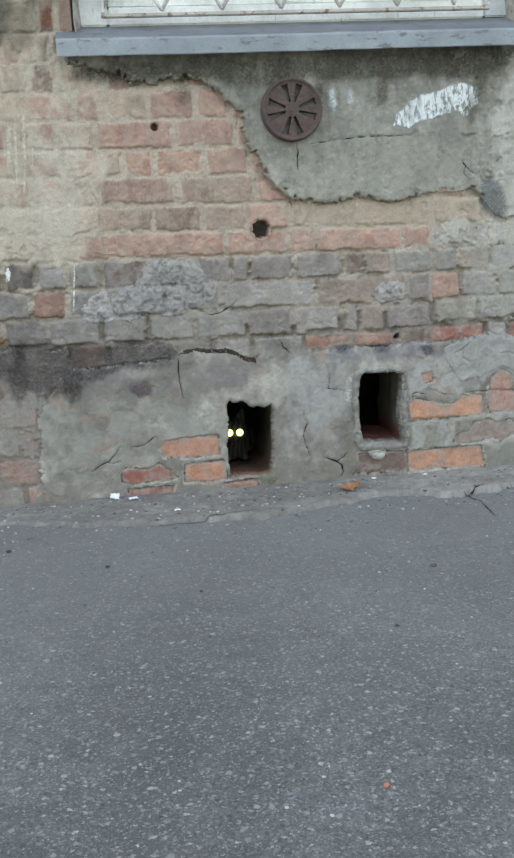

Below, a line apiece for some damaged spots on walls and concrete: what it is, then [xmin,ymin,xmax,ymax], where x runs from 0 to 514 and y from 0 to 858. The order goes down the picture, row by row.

crack [178,348,256,398]
flaking render [353,331,514,475]
spalling [119,433,261,496]
crack [460,485,496,516]